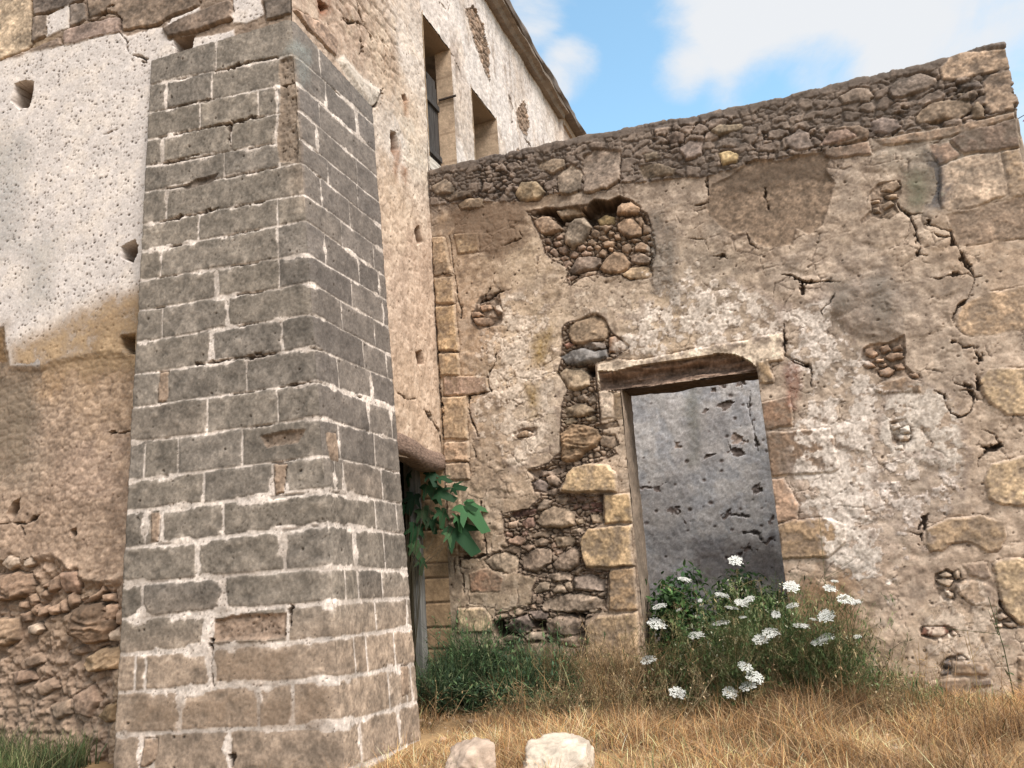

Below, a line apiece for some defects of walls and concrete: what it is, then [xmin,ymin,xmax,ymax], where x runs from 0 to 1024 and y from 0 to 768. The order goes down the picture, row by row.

spalling [860,180,903,225]
crack [780,323,813,389]
crack [781,273,841,318]
crack [895,201,1004,468]
spalling [469,195,971,670]
flaking render [0,329,136,764]
peeling [917,568,1022,677]